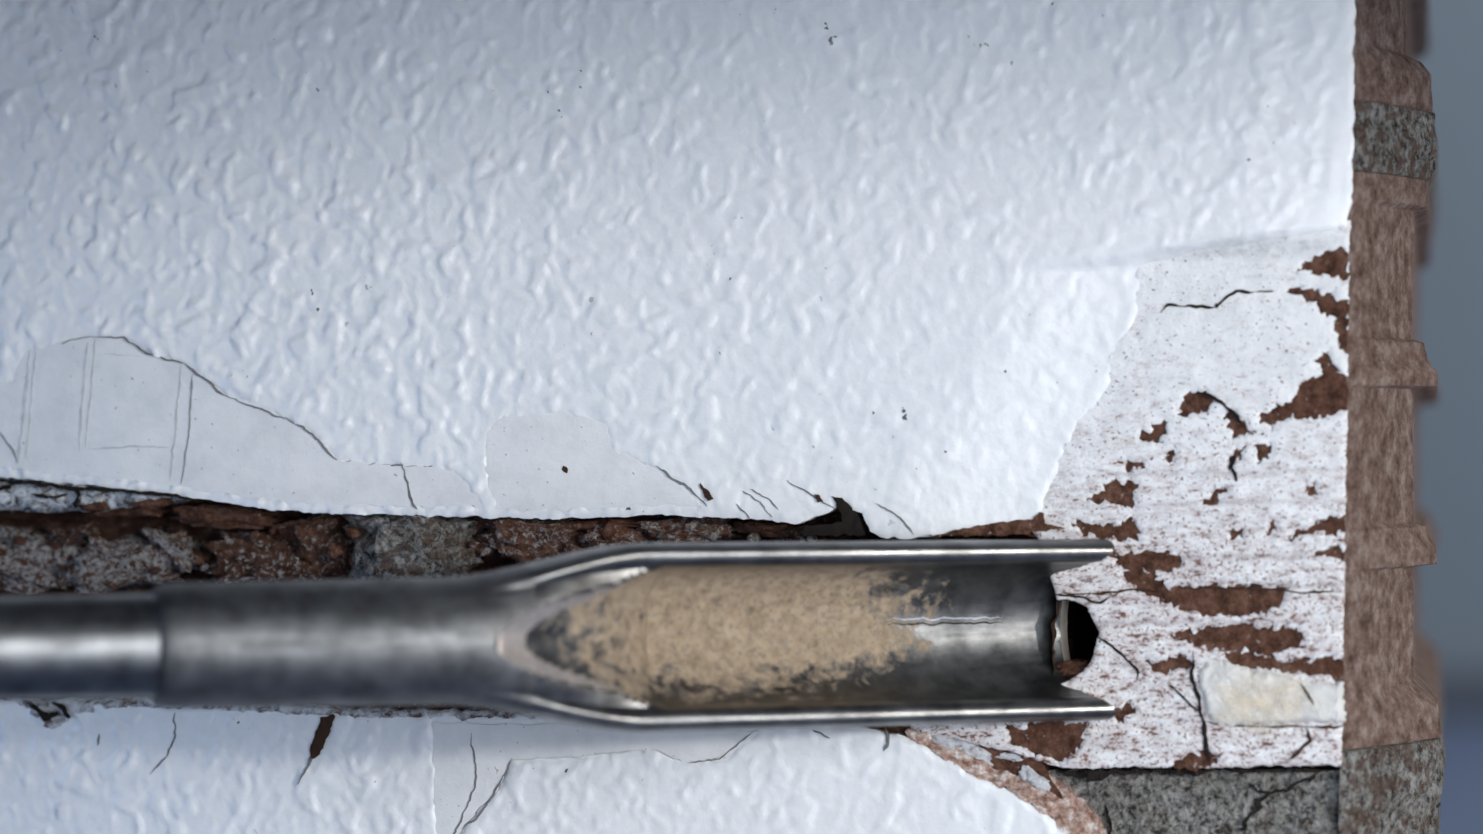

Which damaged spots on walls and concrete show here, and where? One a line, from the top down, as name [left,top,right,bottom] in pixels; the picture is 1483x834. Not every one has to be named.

crack [1161,289,1274,312]
peeling [1139,246,1347,506]
spalling [802,494,867,537]
peeling [925,460,1344,682]
peeling [1114,702,1136,723]
flaking render [905,721,1108,834]
peeling [1173,748,1217,775]